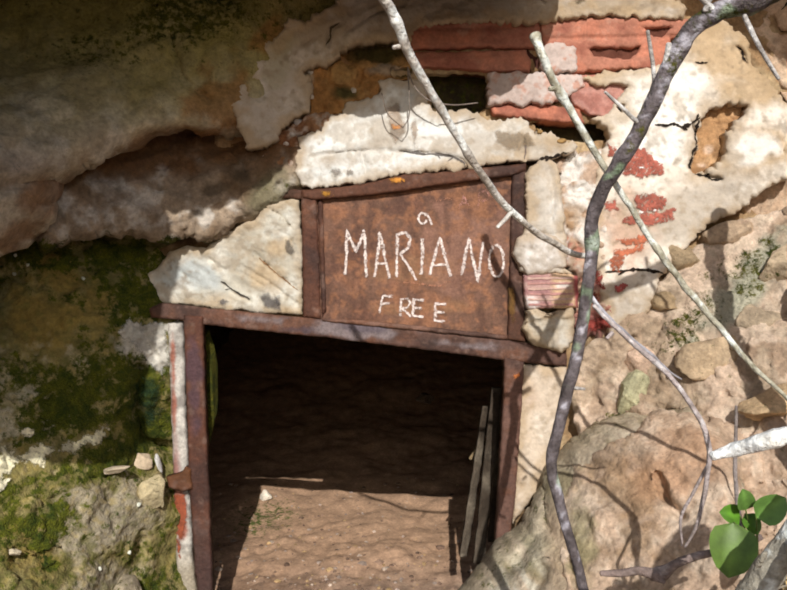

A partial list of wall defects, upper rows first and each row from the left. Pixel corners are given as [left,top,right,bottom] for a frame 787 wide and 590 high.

spalling [429,76,487,113]
peeling [622,148,664,179]
crack [655,114,721,181]
spalling [691,105,742,174]
peeling [605,193,678,273]
flaking render [522,273,579,309]
peeling [591,271,628,305]
crack [606,267,664,275]
peeling [588,317,610,331]
rust [174,494,187,559]